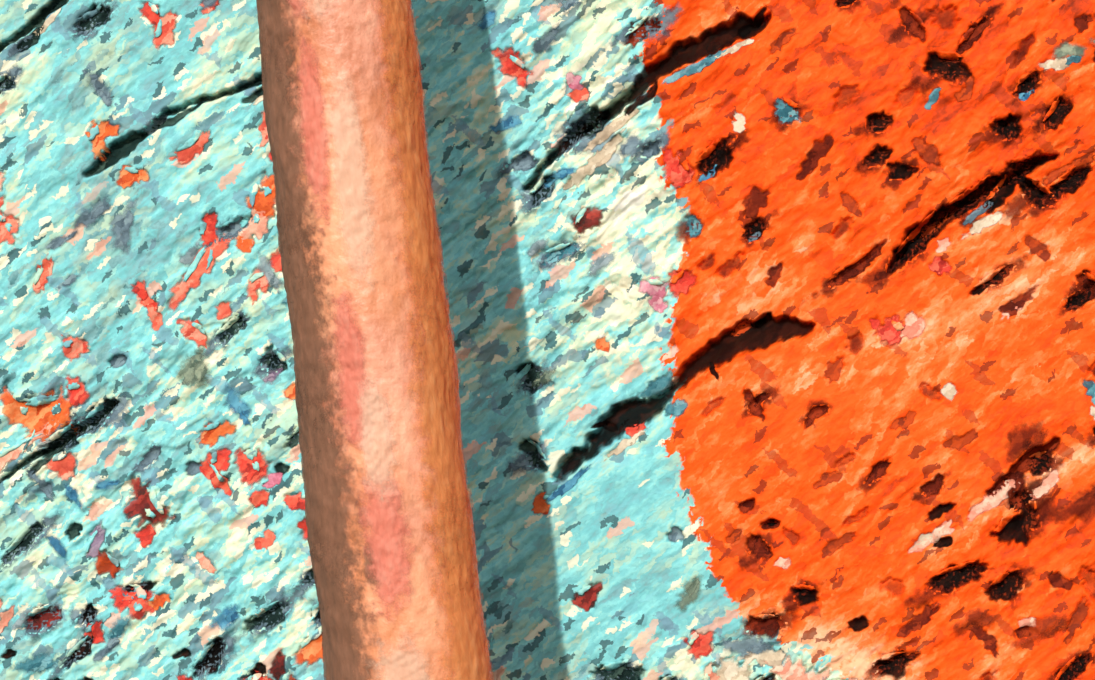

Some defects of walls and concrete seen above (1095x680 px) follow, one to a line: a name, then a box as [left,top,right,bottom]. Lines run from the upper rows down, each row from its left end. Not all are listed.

crack [0,0,69,52]
peeling [85,121,119,161]
crack [84,75,264,177]
crack [524,7,770,190]
crack [887,155,1057,272]
crack [1,400,116,482]
peeling [0,376,128,479]
peeling [63,337,89,361]
spalling [110,355,126,368]
crack [557,313,813,480]